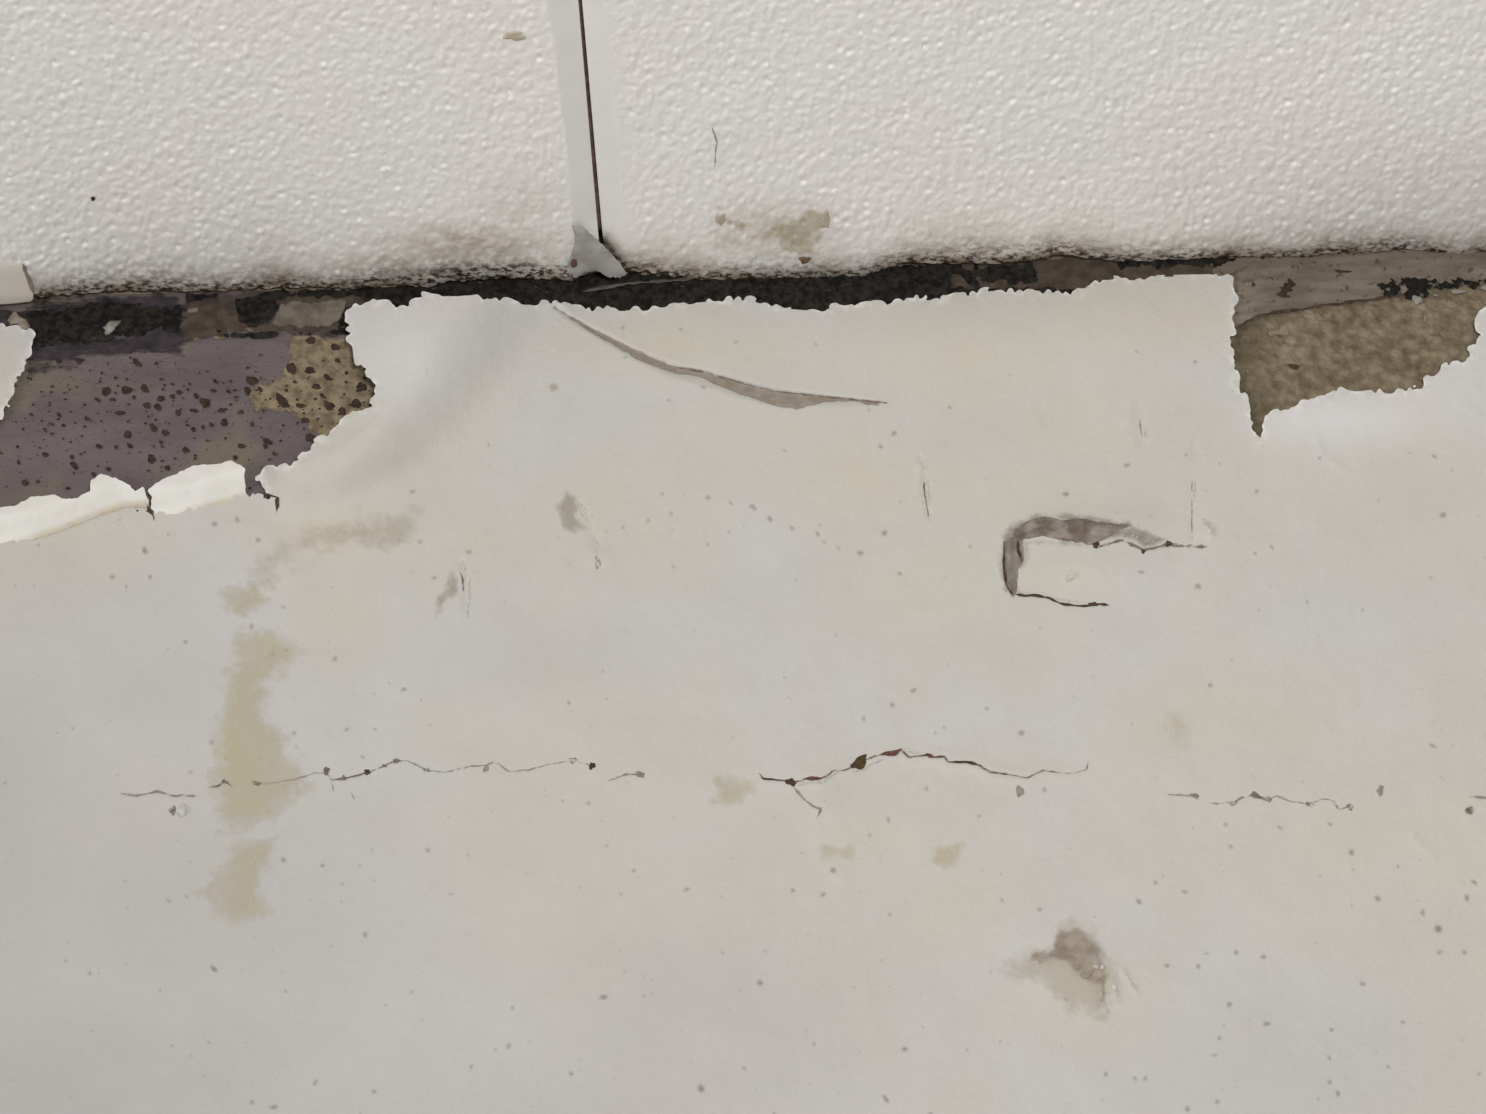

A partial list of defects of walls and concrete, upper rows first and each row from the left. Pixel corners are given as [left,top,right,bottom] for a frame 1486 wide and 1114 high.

peeling [0,289,572,544]
peeling [1211,249,1486,437]
crack [120,758,644,817]
crack [759,748,1089,816]